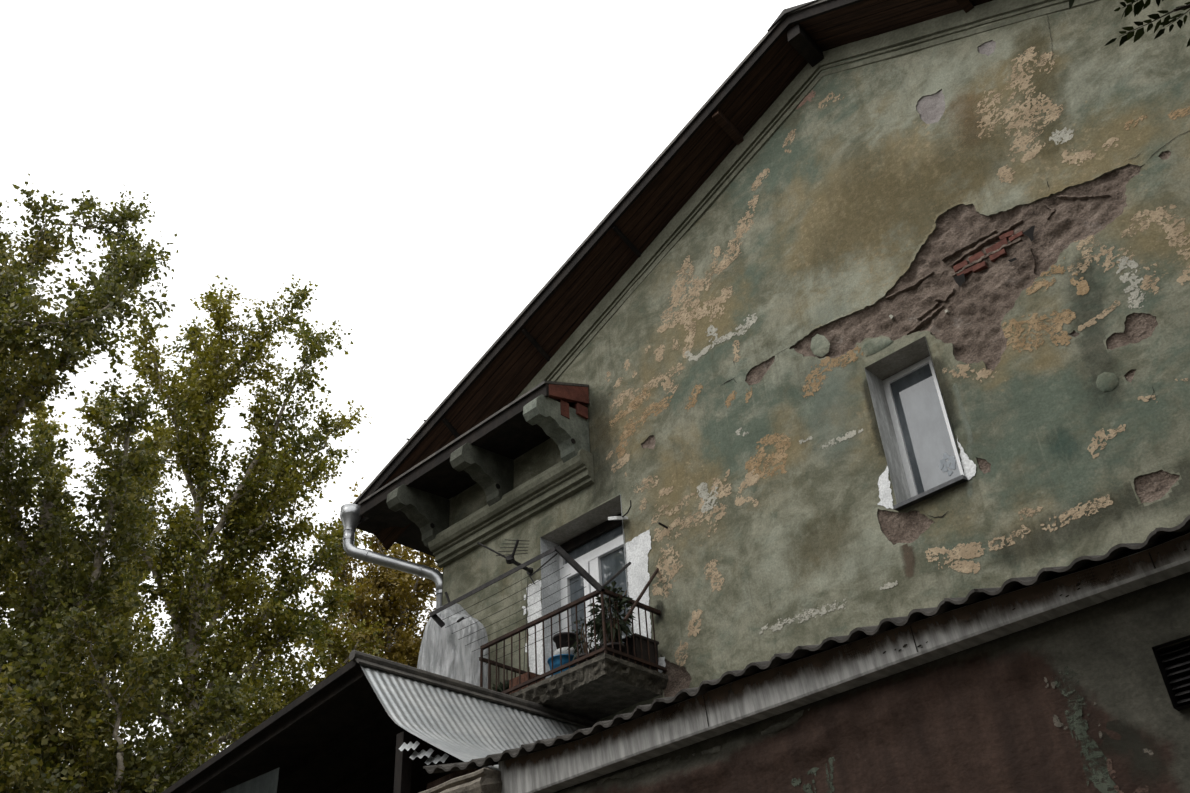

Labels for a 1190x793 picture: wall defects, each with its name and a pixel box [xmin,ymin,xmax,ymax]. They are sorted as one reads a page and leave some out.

peeling [976,46,1147,183]
flaking render [789,163,1190,398]
peeling [605,168,863,598]
flaking render [877,509,935,545]
peeling [925,494,1113,574]
flaking render [1134,470,1180,504]